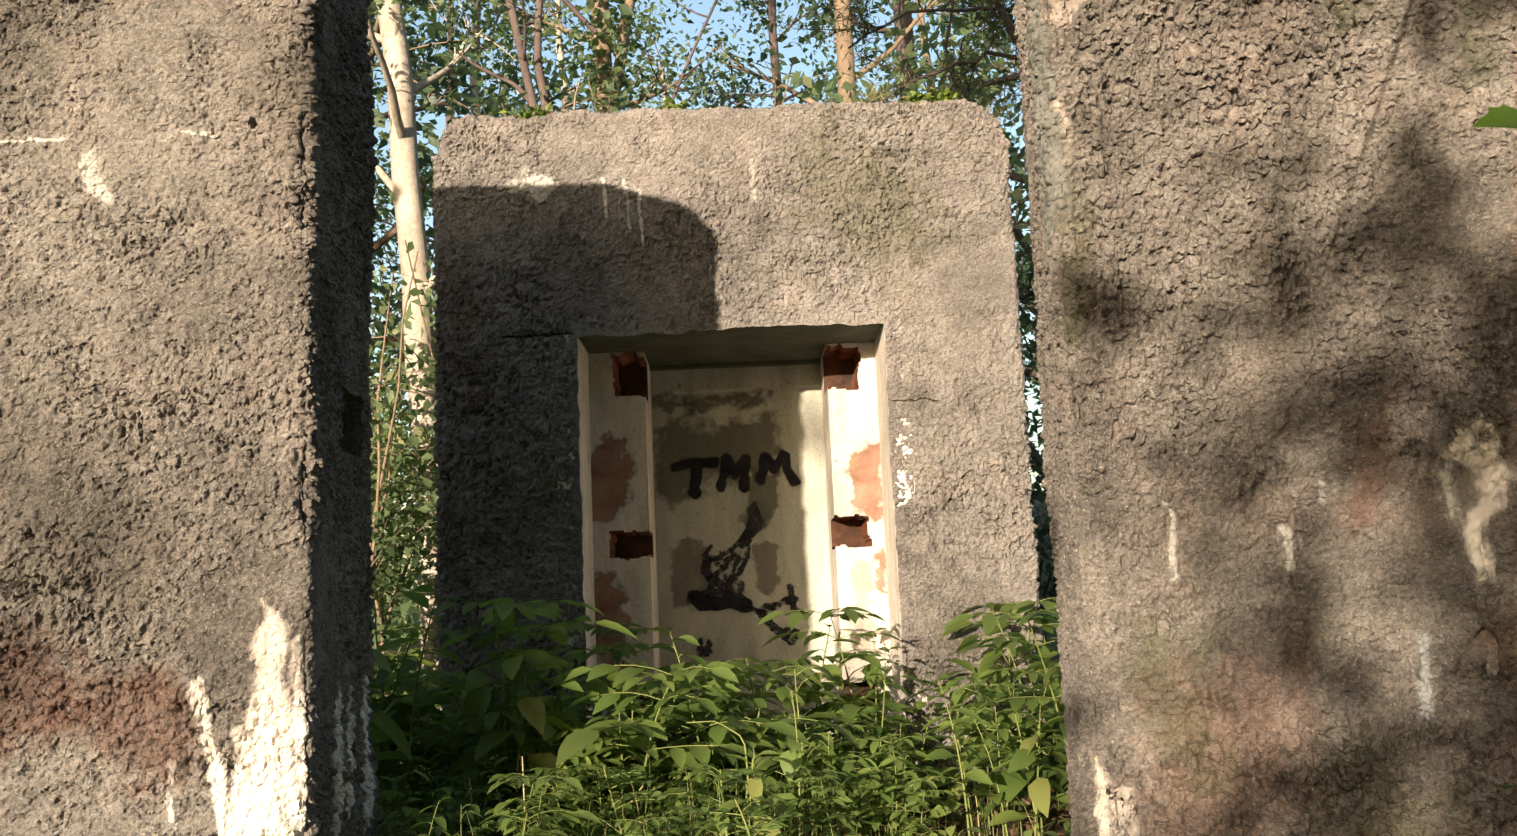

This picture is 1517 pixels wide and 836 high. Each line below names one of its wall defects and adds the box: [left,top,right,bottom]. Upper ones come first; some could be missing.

flaking render [591,432,634,522]
flaking render [847,443,884,522]
flaking render [594,572,631,686]